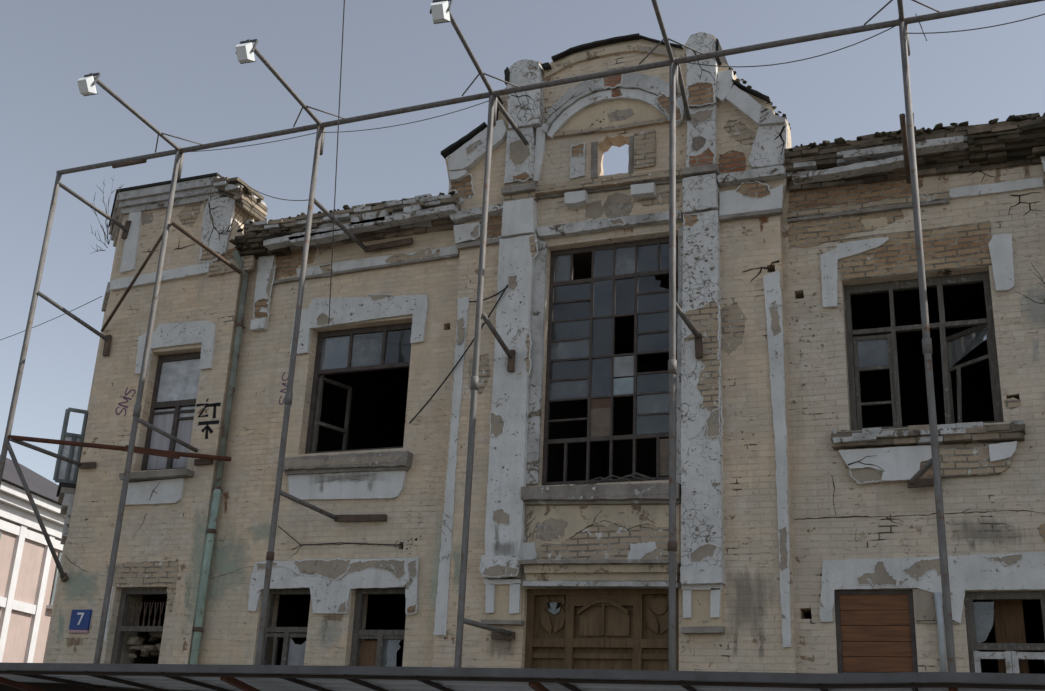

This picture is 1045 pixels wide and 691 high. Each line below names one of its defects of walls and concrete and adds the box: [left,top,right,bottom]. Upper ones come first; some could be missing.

flaking render [507,129,537,182]
flaking render [688,108,724,167]
crack [1008,192,1042,216]
flaking render [489,412,505,451]
flaking render [688,405,724,466]
peeling [849,468,883,485]
crack [794,455,1045,525]
flaking render [256,536,422,615]
crack [570,515,654,539]
flaking render [676,504,719,563]
flaking render [856,557,941,587]
flaking render [982,553,1024,567]